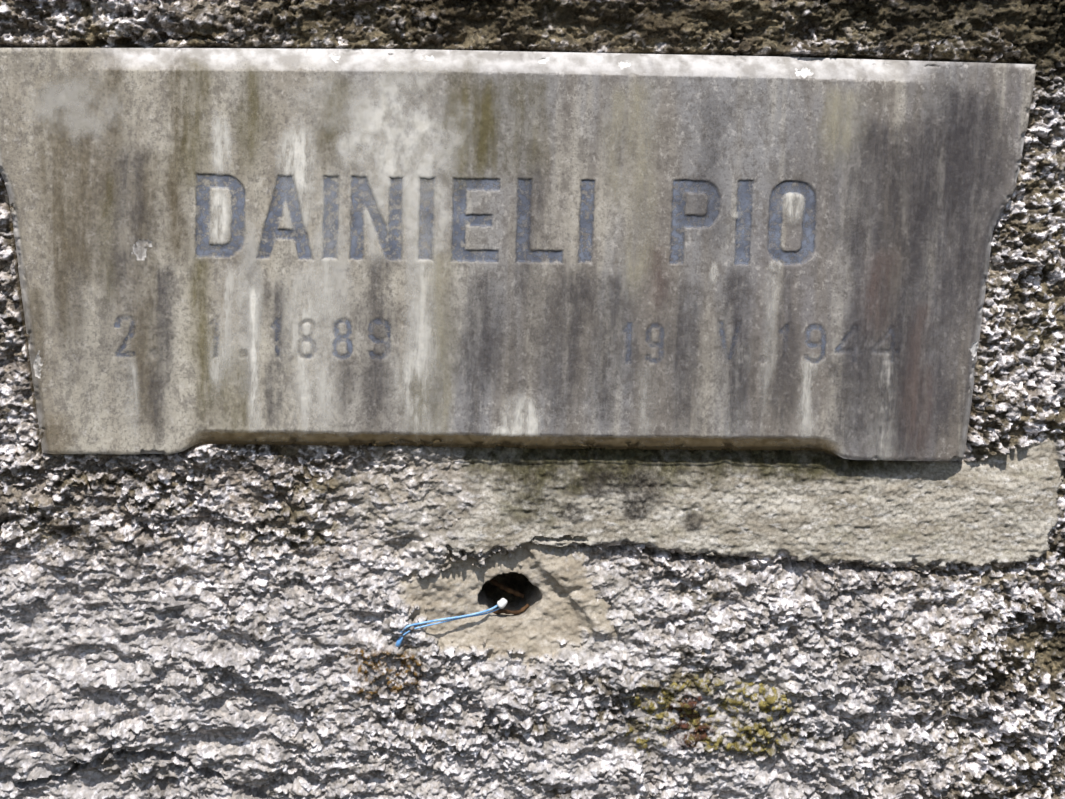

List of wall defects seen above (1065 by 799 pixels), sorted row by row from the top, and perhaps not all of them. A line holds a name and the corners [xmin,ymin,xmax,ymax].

leakage [169,107,195,247]
leakage [213,119,229,172]
leakage [212,189,230,244]
leakage [193,239,260,431]
leakage [279,129,312,224]
leakage [275,256,346,424]
leakage [338,76,494,426]
leakage [464,397,868,521]
leakage [786,193,803,216]
leakage [801,362,812,428]
leakage [877,94,976,454]
peeling [398,435,1065,678]